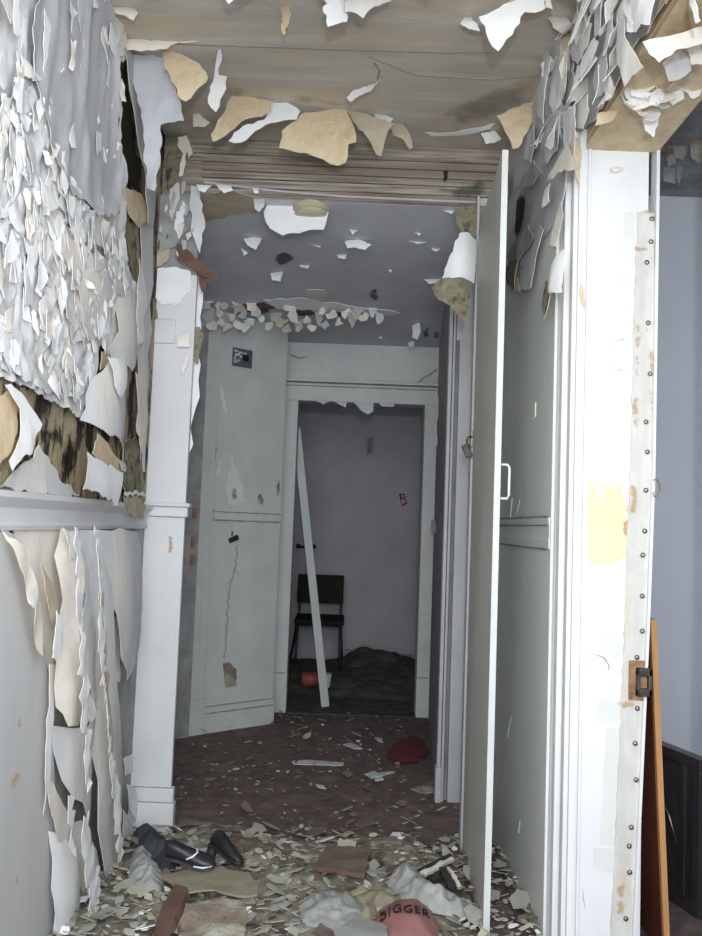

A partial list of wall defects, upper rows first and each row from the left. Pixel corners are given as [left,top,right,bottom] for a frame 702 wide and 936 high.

peeling [0,0,413,519]
peeling [408,323,439,347]
peeling [424,0,702,325]
peeling [2,525,171,936]
spalling [223,662,237,688]
crack [223,544,239,659]
peeling [151,710,543,936]
spalling [586,468,629,567]